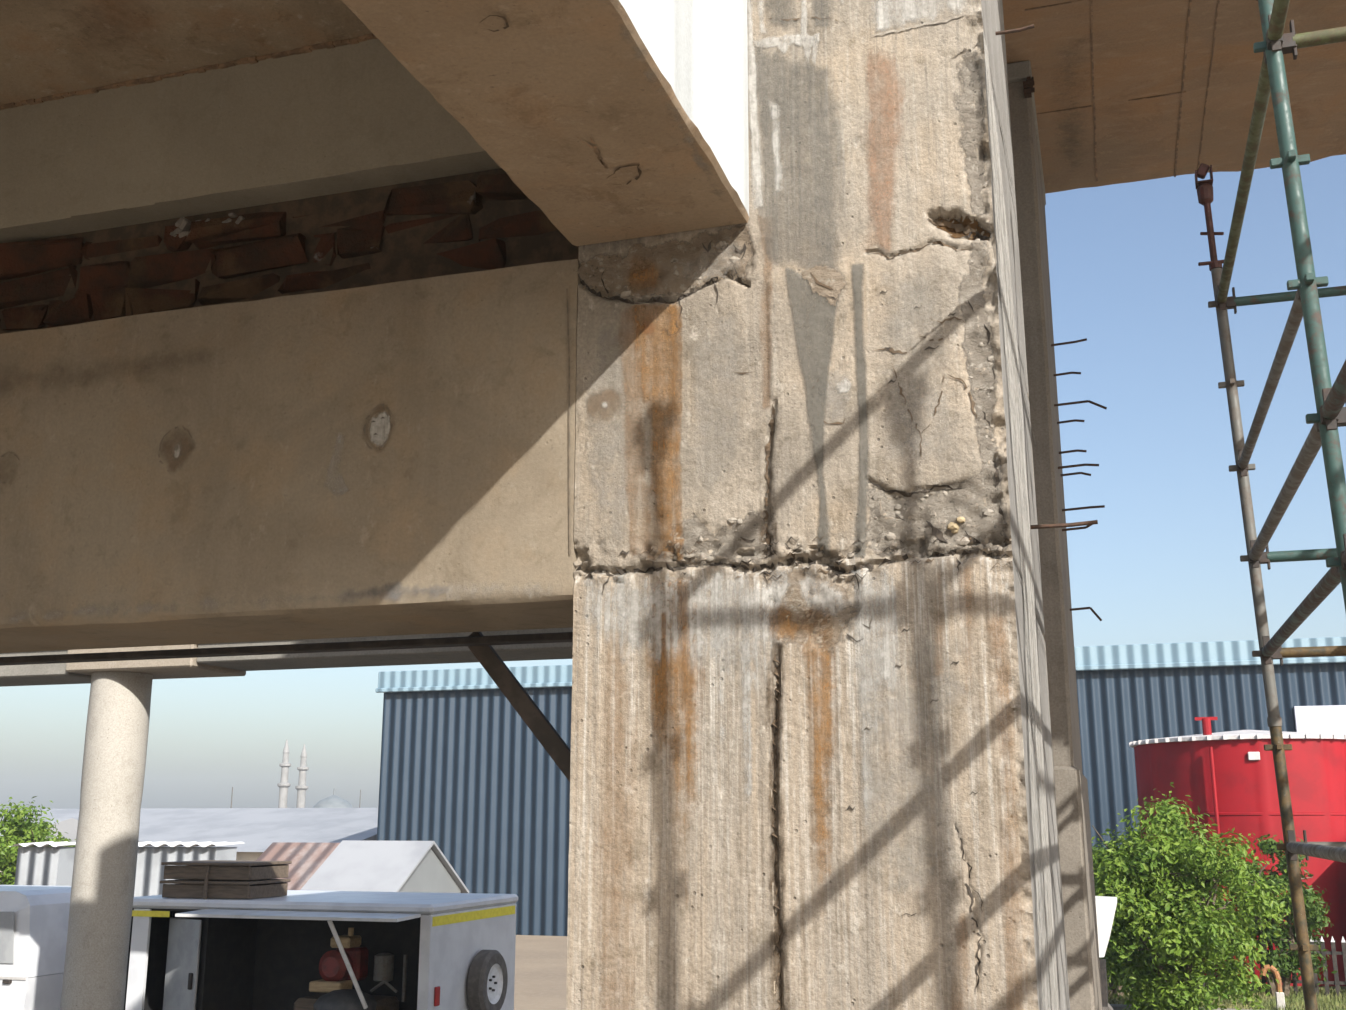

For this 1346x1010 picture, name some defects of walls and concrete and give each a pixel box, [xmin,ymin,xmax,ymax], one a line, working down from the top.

corrosion [633,304,684,561]
spalling [576,225,753,301]
corrosion [648,580,696,788]
spalling [669,511,872,652]
leakage [747,0,838,557]
crack [576,536,1050,668]
corrosion [806,609,832,859]
leakage [852,264,897,701]
crack [868,316,977,497]
spalling [865,50,1007,558]
crack [870,226,1009,323]
crack [954,824,983,991]